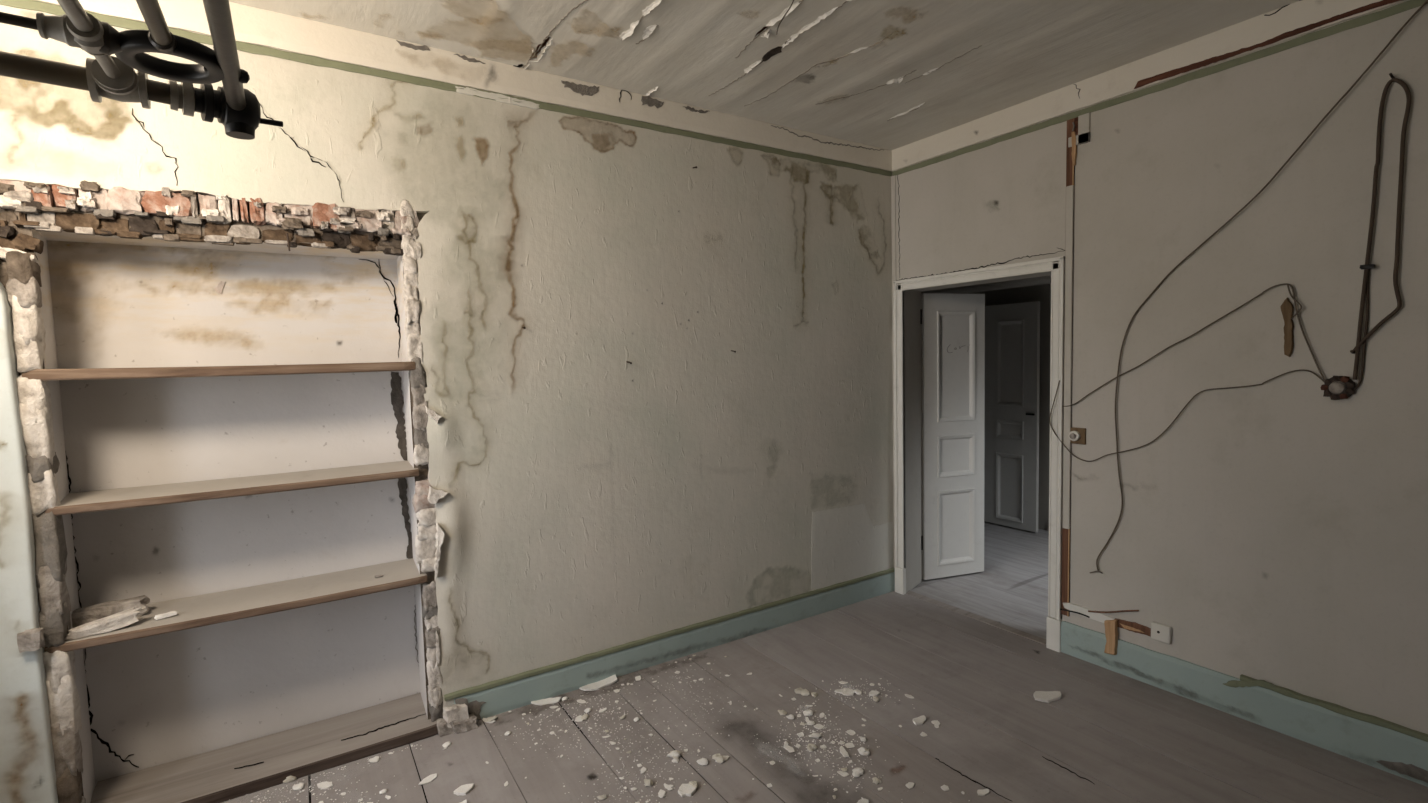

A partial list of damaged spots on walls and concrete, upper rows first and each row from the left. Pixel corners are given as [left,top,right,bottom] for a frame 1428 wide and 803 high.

crack [513,0,588,69]
crack [619,0,662,44]
damp [47,102,129,138]
crack [132,108,178,186]
crack [260,104,344,202]
crack [619,86,659,102]
crack [708,0,982,151]
damp [508,148,518,271]
flaking render [0,179,729,803]
damp [16,696,34,741]
peeling [1376,760,1428,783]